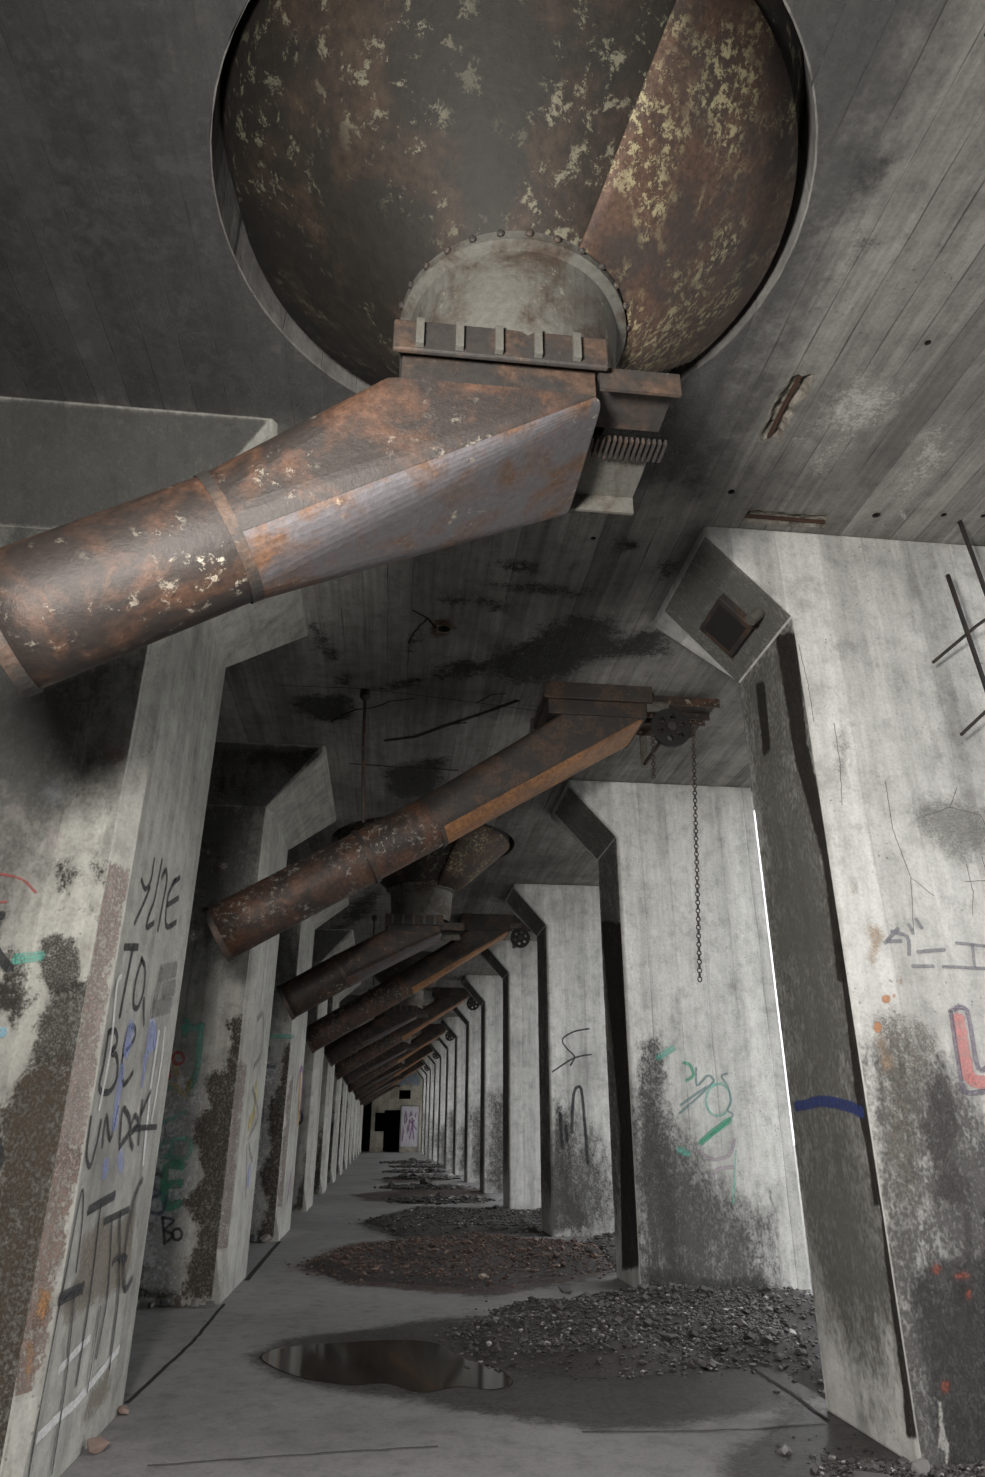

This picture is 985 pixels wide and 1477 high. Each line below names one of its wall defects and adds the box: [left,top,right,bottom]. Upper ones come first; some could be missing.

leakage [291,622,354,723]
leakage [0,975,18,1016]
leakage [39,934,83,995]
leakage [301,921,762,1296]
leakage [756,633,985,1466]
leakage [251,1316,901,1477]